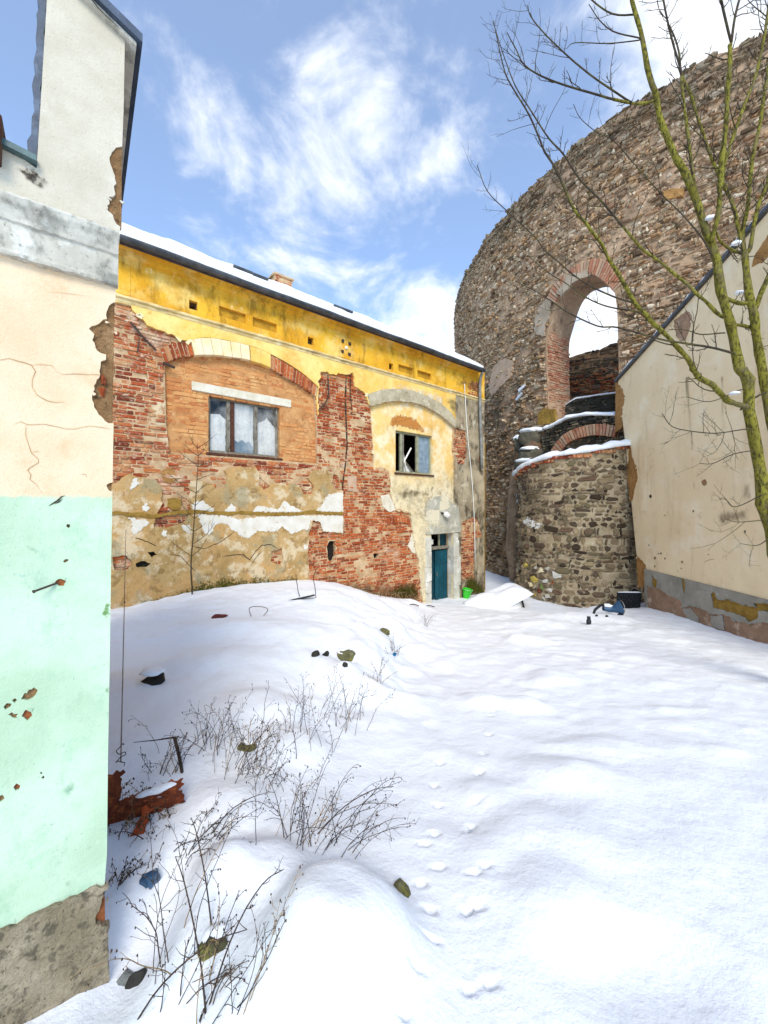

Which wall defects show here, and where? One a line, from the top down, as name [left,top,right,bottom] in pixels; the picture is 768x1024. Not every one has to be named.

flaking render [106,147,124,231]
crack [1,358,109,506]
flaking render [90,303,424,603]
flaking render [451,428,467,464]
flaking render [461,516,481,580]
flaking render [636,553,768,644]
flaking render [4,688,37,719]